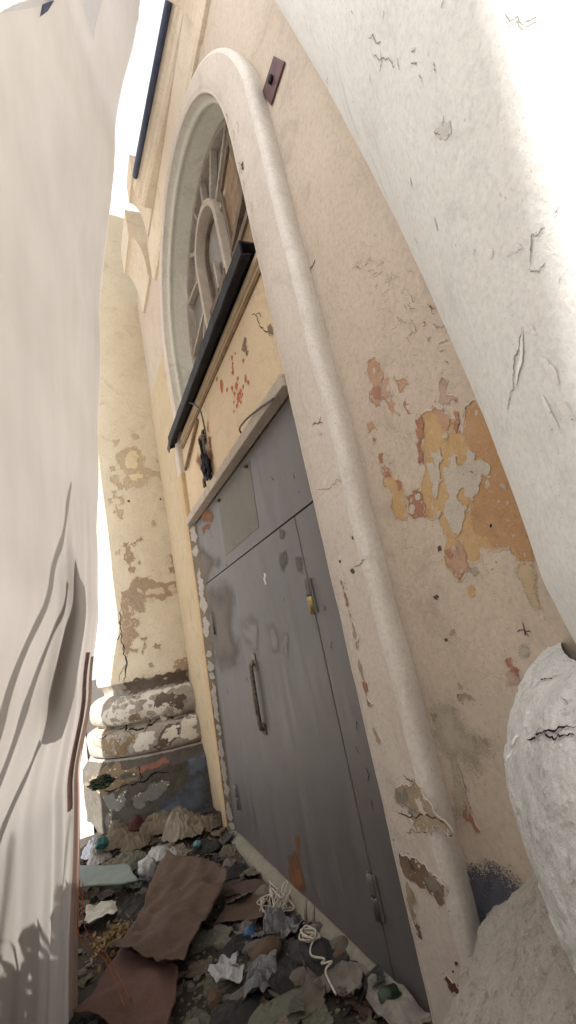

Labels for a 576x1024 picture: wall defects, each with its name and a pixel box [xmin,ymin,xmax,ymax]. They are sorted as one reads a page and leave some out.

crack [529,208,560,282]
crack [507,324,537,409]
peeling [108,433,162,520]
peeling [364,356,537,597]
crack [117,610,128,682]
spalling [85,537,235,833]
peeling [340,579,373,707]
crack [505,660,576,761]
spalling [394,775,457,844]
corrosion [287,834,306,895]
spalling [393,839,450,945]
leakage [465,859,522,924]